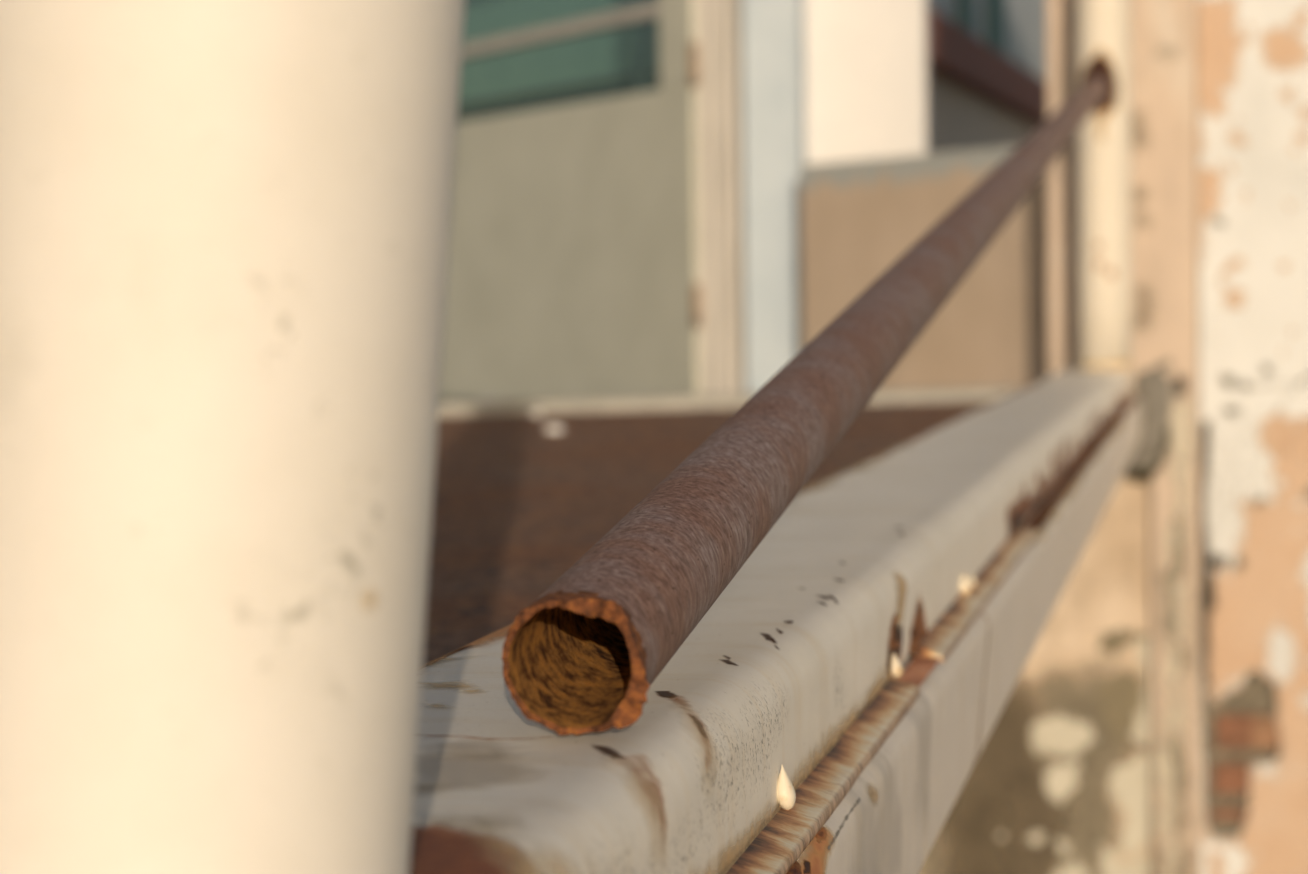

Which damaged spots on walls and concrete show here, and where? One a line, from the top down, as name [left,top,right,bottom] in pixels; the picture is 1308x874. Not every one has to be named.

peeling [1198,0,1308,266]
rust [887,575,928,677]
peeling [1025,359,1191,874]
peeling [1200,410,1308,874]
rust [409,825,538,874]
rust [798,828,833,874]
damp [921,669,1134,874]